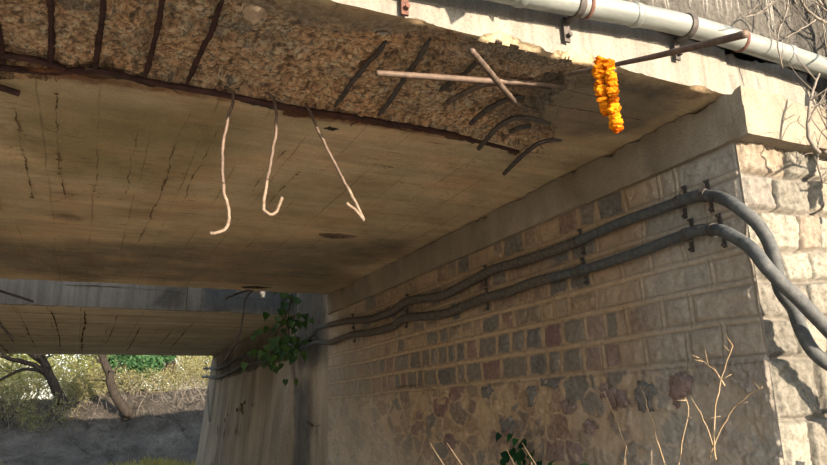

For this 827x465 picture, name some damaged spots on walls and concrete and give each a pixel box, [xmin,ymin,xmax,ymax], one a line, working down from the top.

spalling [615,30,749,67]
crack [77,67,398,129]
spalling [0,0,593,235]
crack [4,93,223,241]
crack [248,148,300,203]
crack [0,309,140,356]